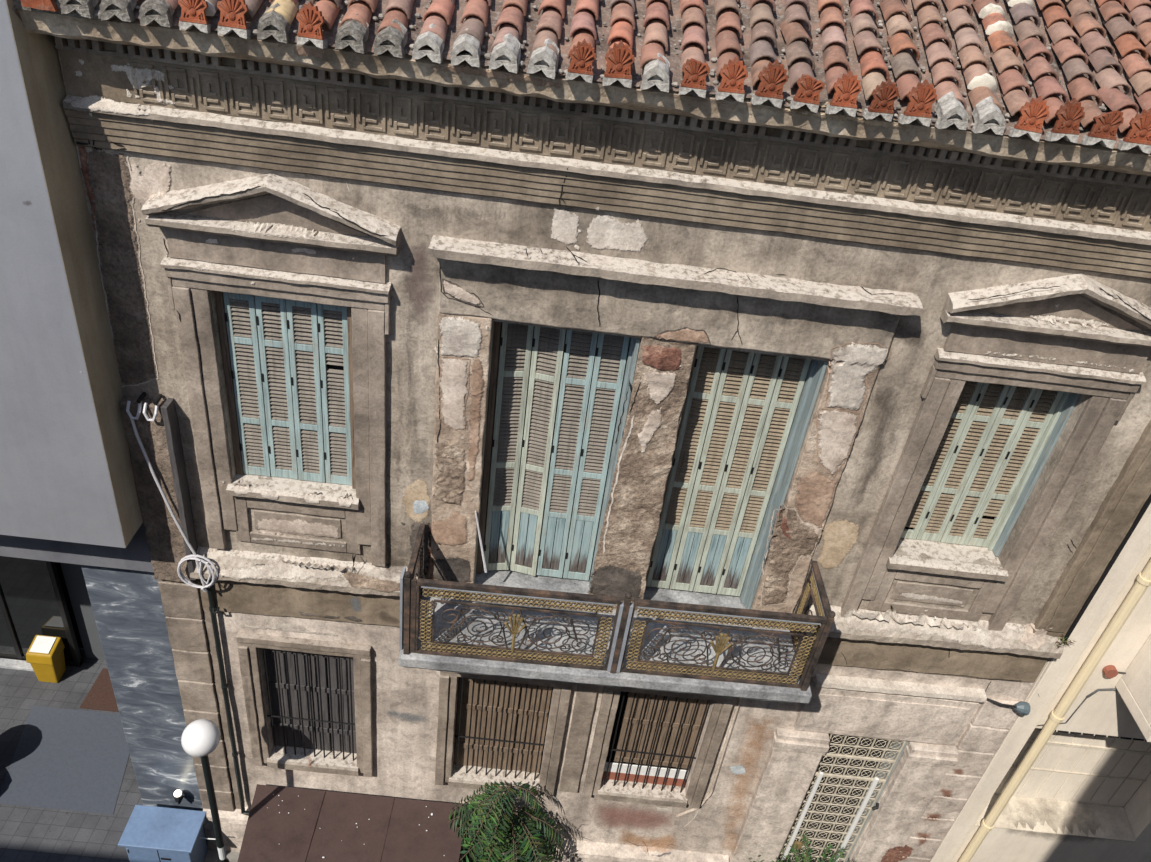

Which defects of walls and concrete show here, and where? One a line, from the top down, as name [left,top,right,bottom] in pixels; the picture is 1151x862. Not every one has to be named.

peeling [71,63,177,122]
crack [303,182,386,236]
peeling [551,206,648,253]
peeling [442,272,487,307]
peeling [432,317,489,505]
flaking render [638,327,711,453]
flaking render [760,341,891,606]